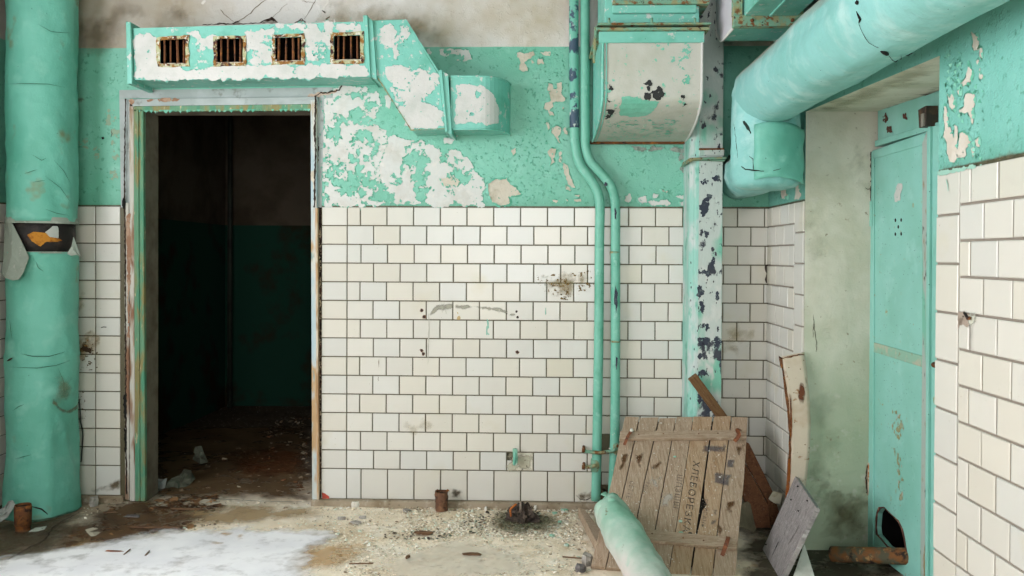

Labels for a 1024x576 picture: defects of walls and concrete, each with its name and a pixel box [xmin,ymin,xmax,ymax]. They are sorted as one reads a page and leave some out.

crack [203,0,316,25]
peeling [133,0,523,210]
peeling [643,80,665,101]
peeling [943,32,985,164]
peeling [699,175,719,217]
peeling [696,257,722,377]